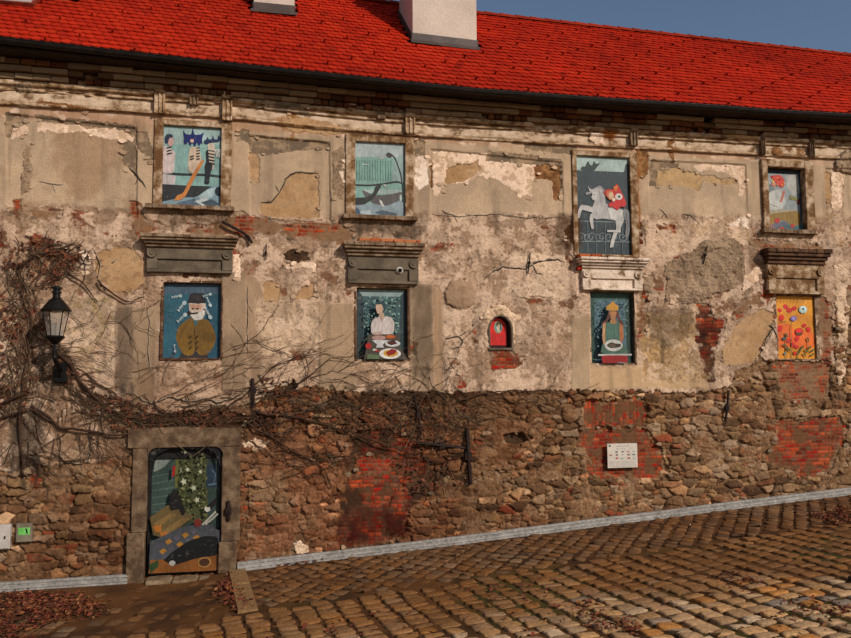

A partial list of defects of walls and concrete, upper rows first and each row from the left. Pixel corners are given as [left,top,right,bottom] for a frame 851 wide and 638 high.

peeling [4,83,154,250]
crack [261,171,317,203]
spalling [235,100,351,201]
peeling [413,136,577,201]
spalling [636,138,749,198]
spalling [127,173,355,272]
spalling [639,221,679,250]
peeling [726,213,751,229]
spalling [76,247,146,294]
crack [484,258,564,280]
spalling [131,237,851,570]
spalling [0,448,133,582]